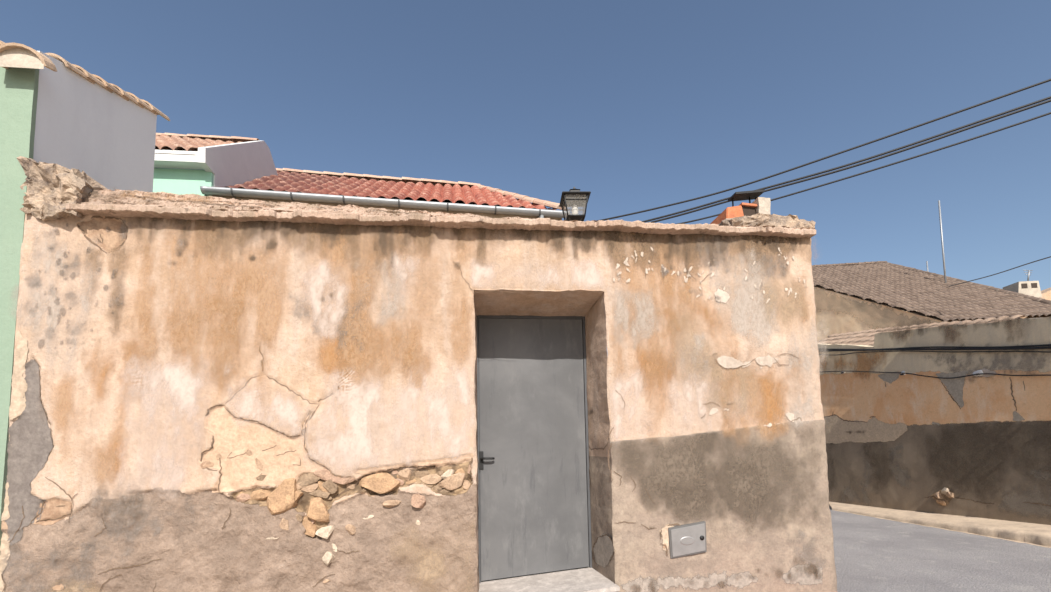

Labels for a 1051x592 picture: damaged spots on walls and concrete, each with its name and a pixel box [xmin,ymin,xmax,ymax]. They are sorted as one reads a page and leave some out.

peeling [613,247,730,303]
leakage [551,230,803,341]
peeling [0,331,54,592]
leakage [128,363,200,416]
crack [225,347,346,435]
leakage [161,218,475,468]
flaking render [199,405,473,566]
leakage [612,373,800,523]
peeling [713,353,798,369]
peeling [824,414,907,444]
peeling [936,371,968,409]
leakage [927,422,1051,496]